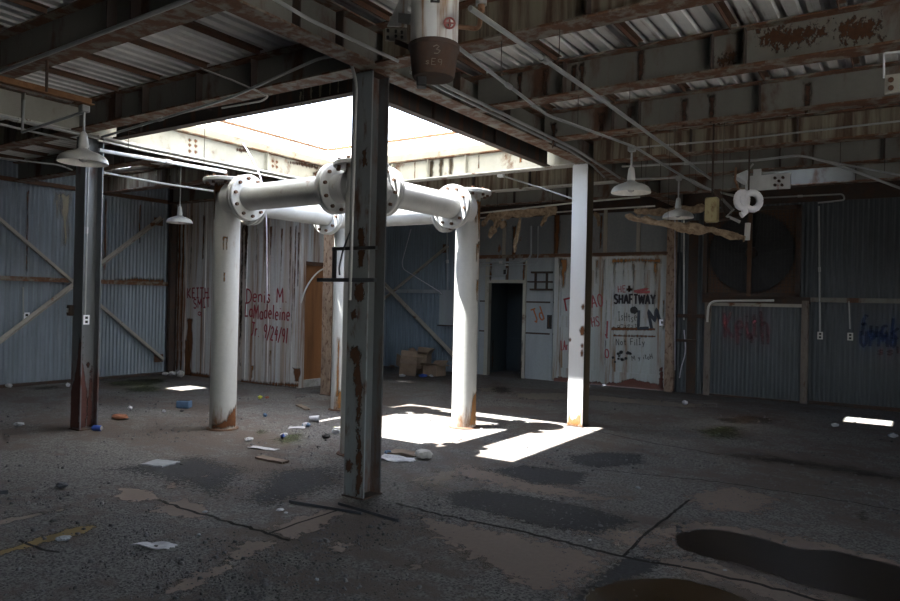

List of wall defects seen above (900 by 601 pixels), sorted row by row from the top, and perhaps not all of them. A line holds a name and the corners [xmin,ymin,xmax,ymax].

rust [755,11,887,53]
rust [212,405,236,429]
crack [158,499,337,541]
crack [395,469,899,601]
water stain [675,529,900,601]